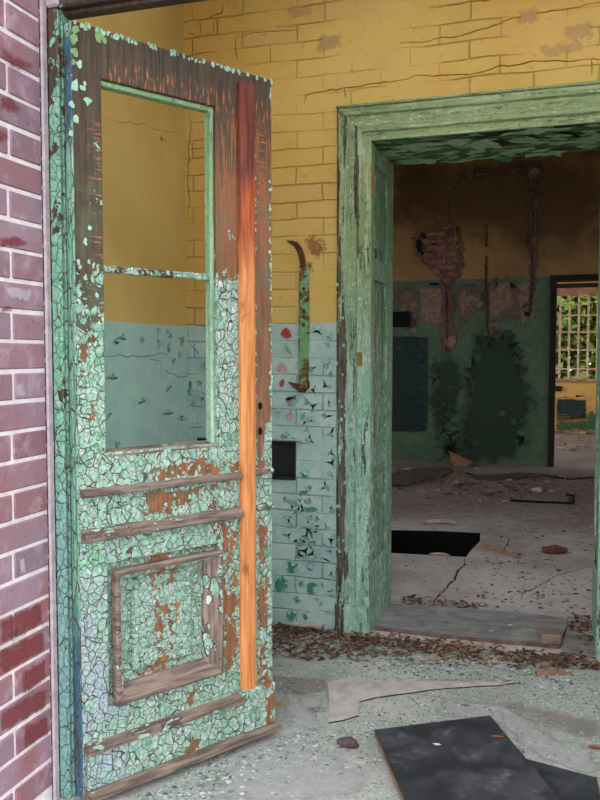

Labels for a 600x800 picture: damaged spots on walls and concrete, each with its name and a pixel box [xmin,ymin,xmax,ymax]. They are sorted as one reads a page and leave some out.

crack [400,0,600,44]
peeling [71,79,92,106]
peeling [170,49,273,85]
crack [304,58,600,103]
peeling [382,124,600,179]
rust [305,235,326,272]
spalling [400,225,538,384]
leakage [392,160,600,464]
peeling [79,337,120,452]
peeling [269,361,353,444]
peeling [274,448,345,622]
crack [433,558,467,606]